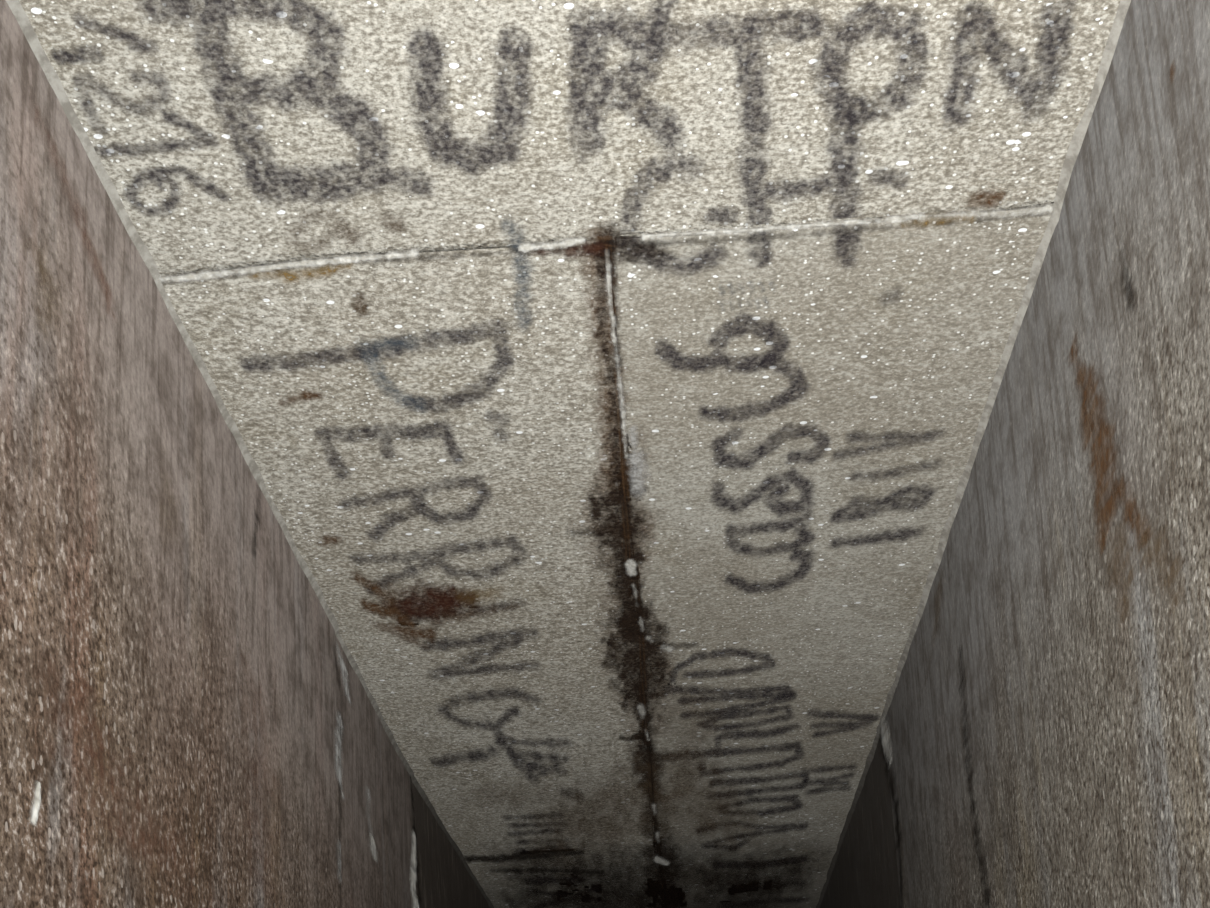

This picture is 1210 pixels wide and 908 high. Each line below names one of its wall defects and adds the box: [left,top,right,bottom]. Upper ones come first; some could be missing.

crack [158,250,418,282]
crack [642,215,926,240]
crack [957,205,1052,216]
crack [519,239,643,613]
rust [354,574,494,641]
damp [528,227,783,908]
crack [620,647,672,754]
crack [649,784,669,908]